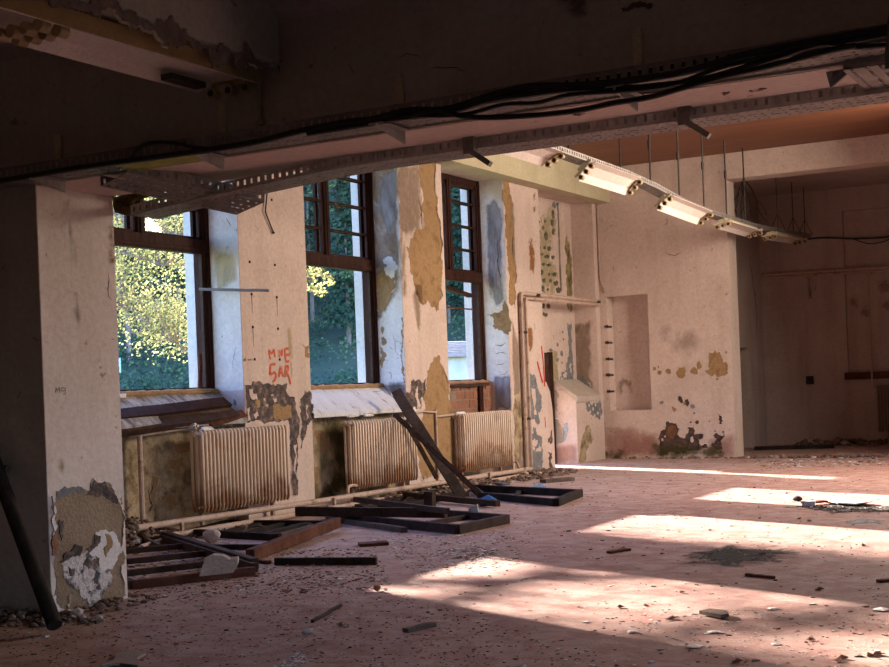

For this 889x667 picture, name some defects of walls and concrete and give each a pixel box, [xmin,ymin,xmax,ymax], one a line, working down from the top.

flaking render [376,256,399,312]
flaking render [406,163,443,312]
water stain [487,201,516,305]
peeling [539,202,573,312]
peeling [233,381,397,498]
flaking render [400,318,494,482]
flaking render [513,373,565,470]
peeling [549,324,591,387]
flaking render [578,401,603,463]
flaking render [653,350,728,380]
peeling [656,396,725,455]
flaking render [49,430,235,612]